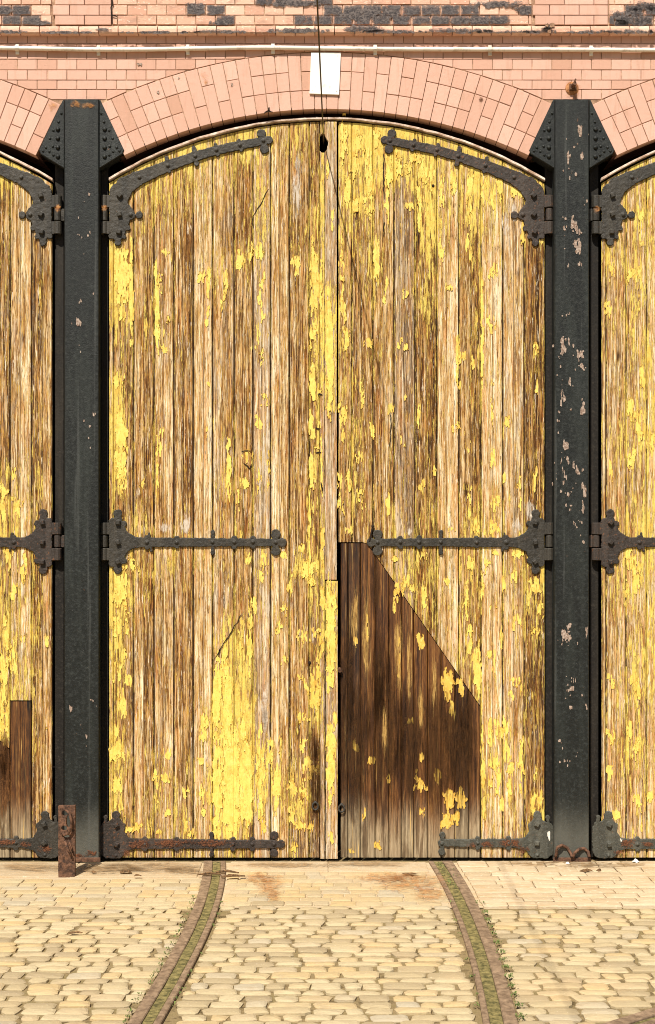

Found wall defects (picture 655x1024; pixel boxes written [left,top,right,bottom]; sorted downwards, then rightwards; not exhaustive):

peeling [326,113,524,265]
peeling [114,235,135,347]
peeling [114,405,166,498]
peeling [245,210,350,724]
peeling [552,336,586,544]
peeling [108,554,162,835]
corrosion [123,839,231,856]
crack [212,614,242,663]
peeling [182,596,337,853]
peeling [413,752,468,829]
peeling [441,486,544,820]
corrosion [469,838,528,853]